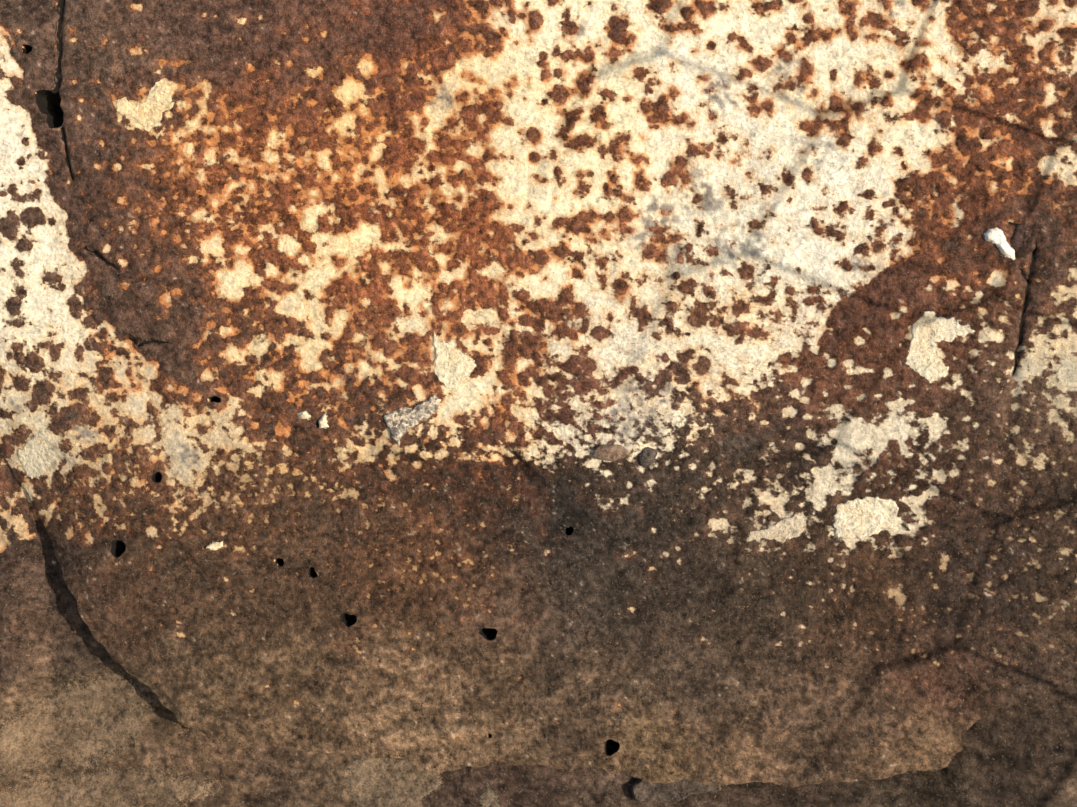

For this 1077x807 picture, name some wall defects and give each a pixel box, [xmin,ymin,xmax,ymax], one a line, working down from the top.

crack [50,0,65,93]
rust [646,0,729,50]
rust [727,0,918,118]
crack [61,127,73,179]
rust [421,89,514,189]
rust [537,8,736,209]
rust [797,68,893,148]
rust [0,184,56,279]
rust [551,171,639,290]
rust [612,271,804,345]
crack [1009,222,1037,375]
rust [6,335,66,417]